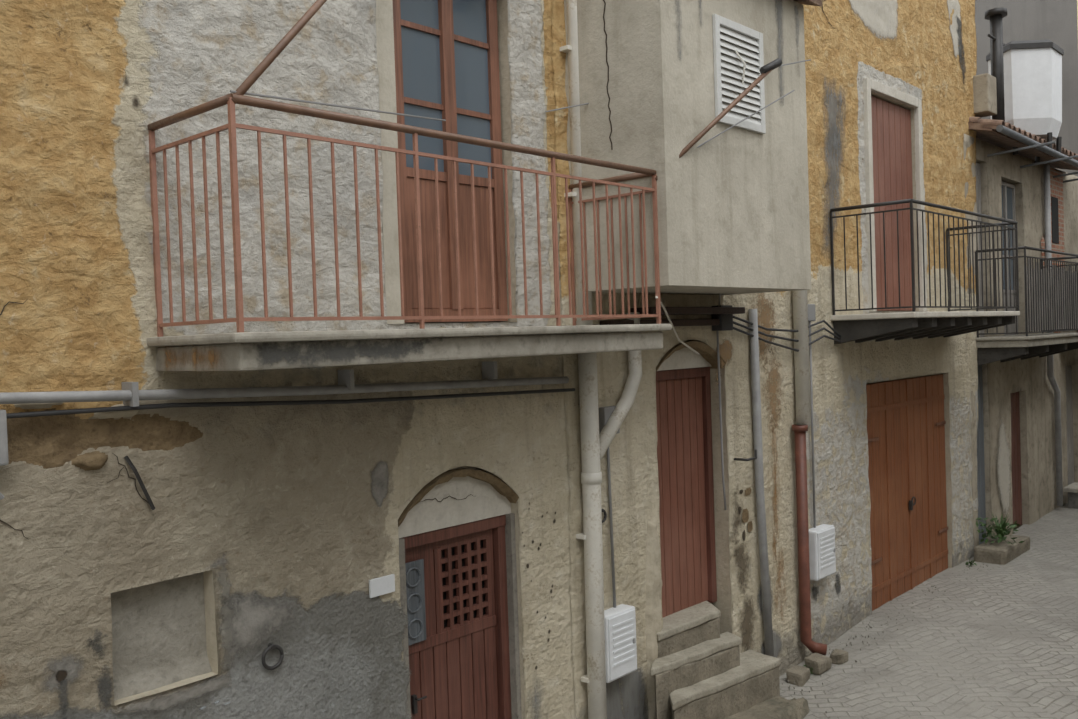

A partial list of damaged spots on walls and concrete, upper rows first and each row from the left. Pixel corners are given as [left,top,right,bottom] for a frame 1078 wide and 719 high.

crack [603,0,613,150]
peeling [849,0,898,39]
flaking render [7,403,203,471]
peeling [119,557,294,711]